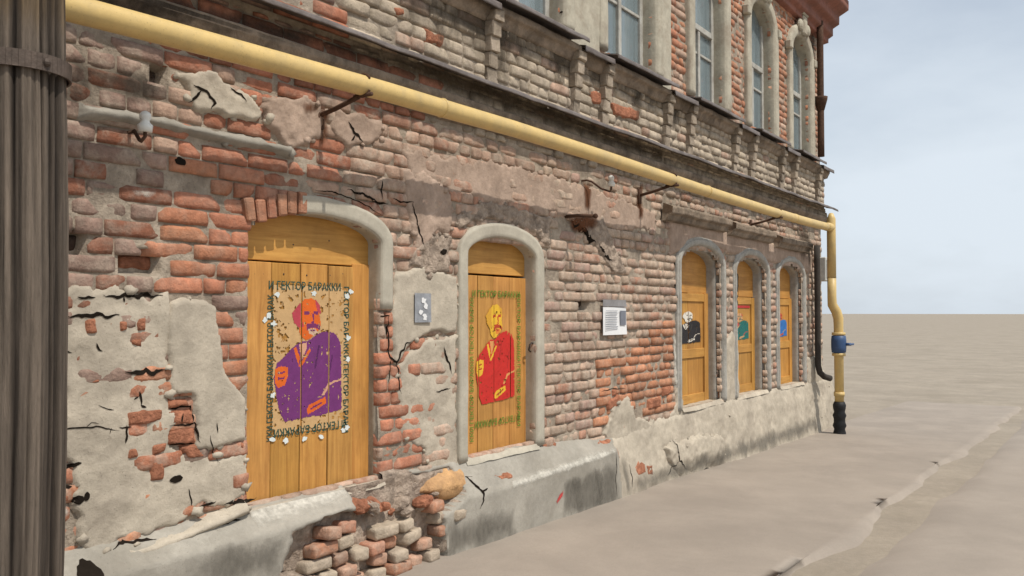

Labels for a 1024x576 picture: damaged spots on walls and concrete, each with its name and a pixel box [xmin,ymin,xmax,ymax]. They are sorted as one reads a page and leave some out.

crack [190,85,247,109]
spalling [173,70,385,149]
crack [349,122,363,142]
crack [316,181,425,247]
crack [574,223,612,261]
crack [381,315,411,391]
spalling [281,149,812,576]
peeling [807,356,830,387]
peeling [66,285,252,576]
crack [465,476,488,506]